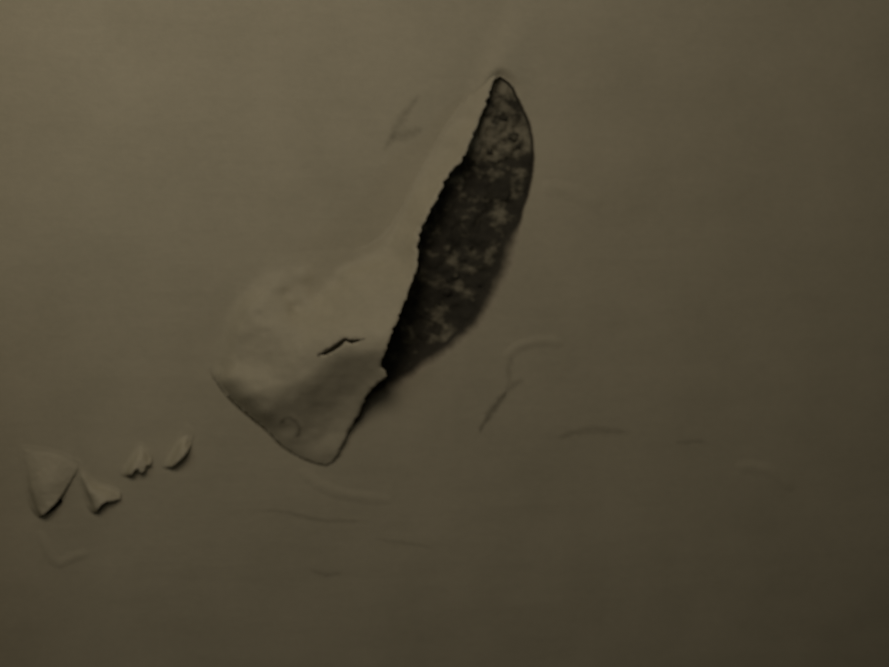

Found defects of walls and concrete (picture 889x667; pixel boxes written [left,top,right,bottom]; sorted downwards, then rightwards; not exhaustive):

flaking render [208,75,536,466]